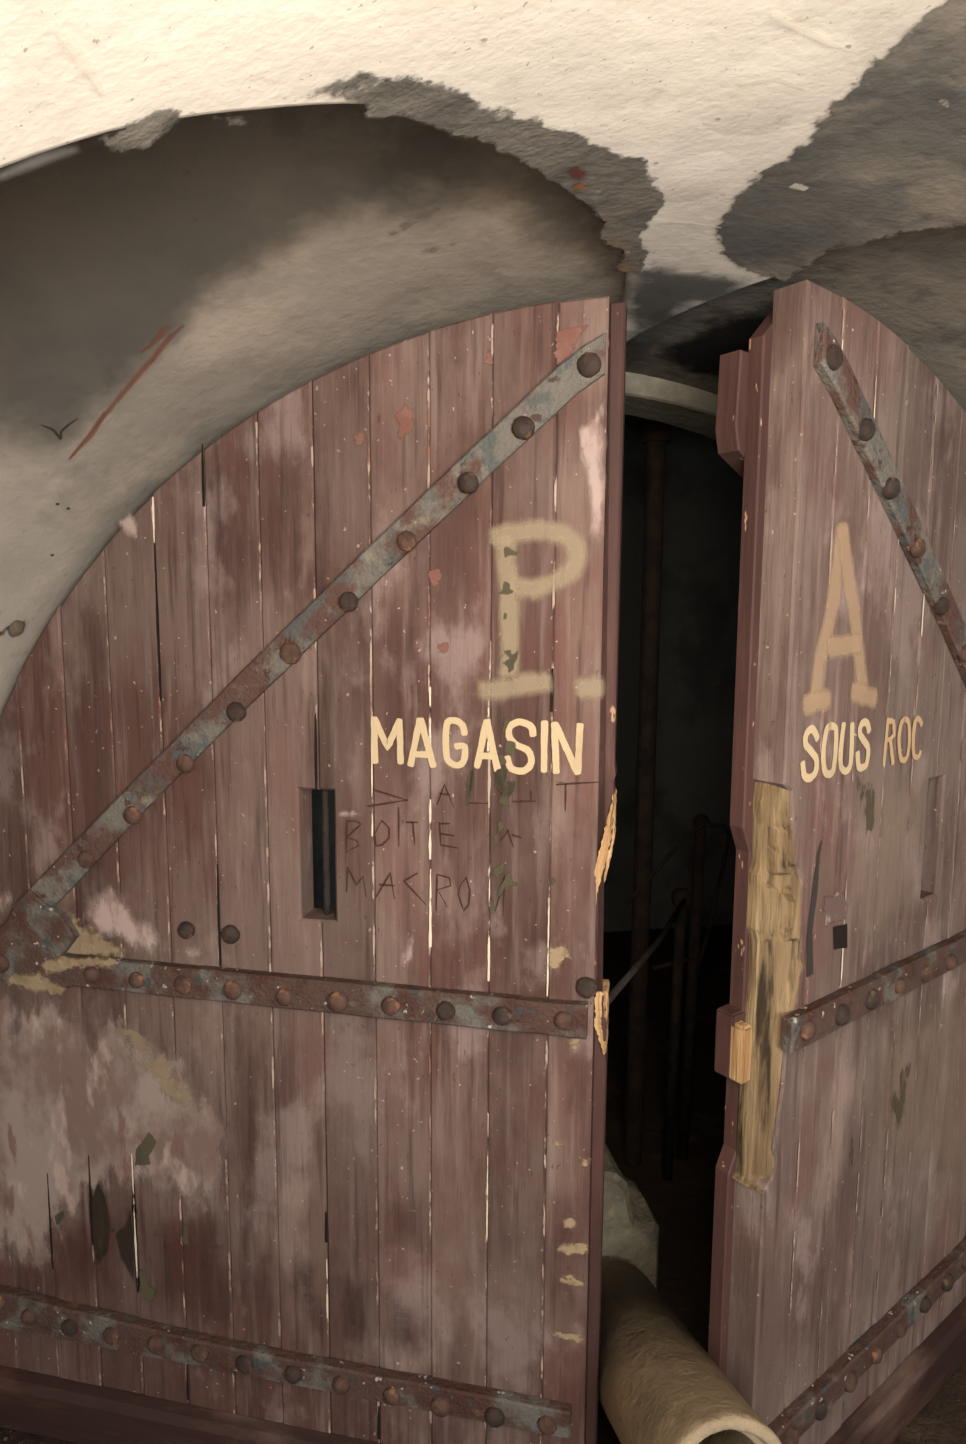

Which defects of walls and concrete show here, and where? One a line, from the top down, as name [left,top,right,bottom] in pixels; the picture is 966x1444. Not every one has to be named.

flaking render [103,109,182,152]
damp [0,104,588,433]
flaking render [312,72,665,273]
flaking render [716,0,966,282]